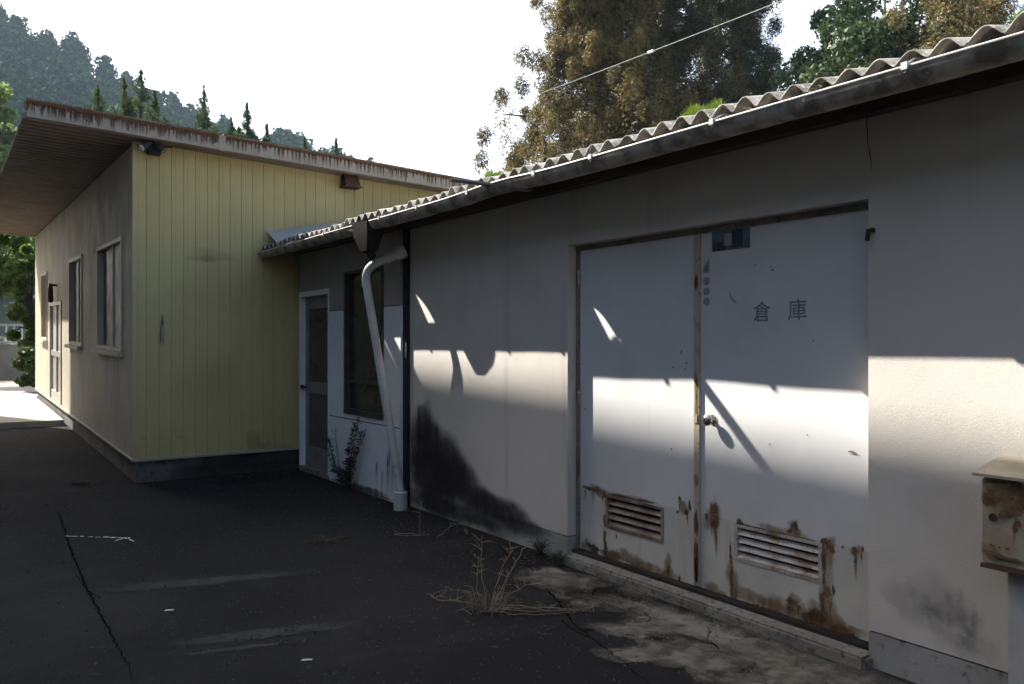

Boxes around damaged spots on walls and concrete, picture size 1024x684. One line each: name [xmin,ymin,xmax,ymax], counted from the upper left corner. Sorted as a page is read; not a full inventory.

rust [24,100,466,187]
water stain [411,410,540,535]
rust [581,496,864,639]